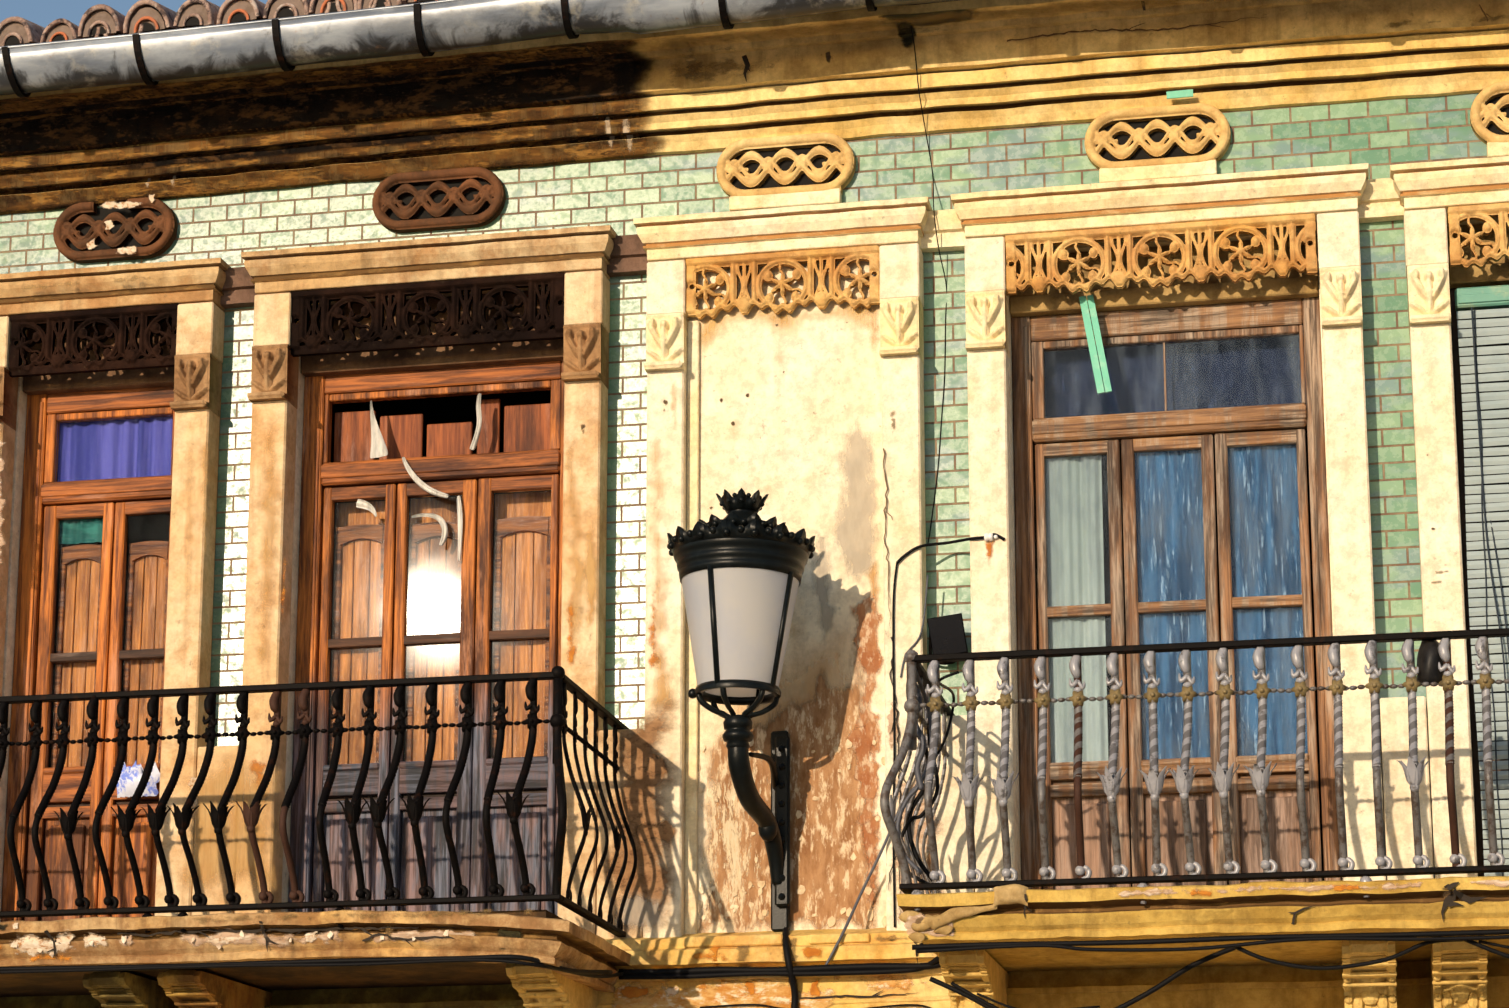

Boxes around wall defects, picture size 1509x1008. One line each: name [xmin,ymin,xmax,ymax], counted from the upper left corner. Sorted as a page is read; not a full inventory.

crack [1007,5,1264,42]
damp [0,39,662,215]
spalling [87,194,155,249]
spalling [117,246,136,254]
damp [816,432,876,631]
peeling [0,923,132,958]
peeling [181,928,341,950]
peeling [372,930,474,942]
peeling [612,976,840,1008]
peeling [861,975,926,990]